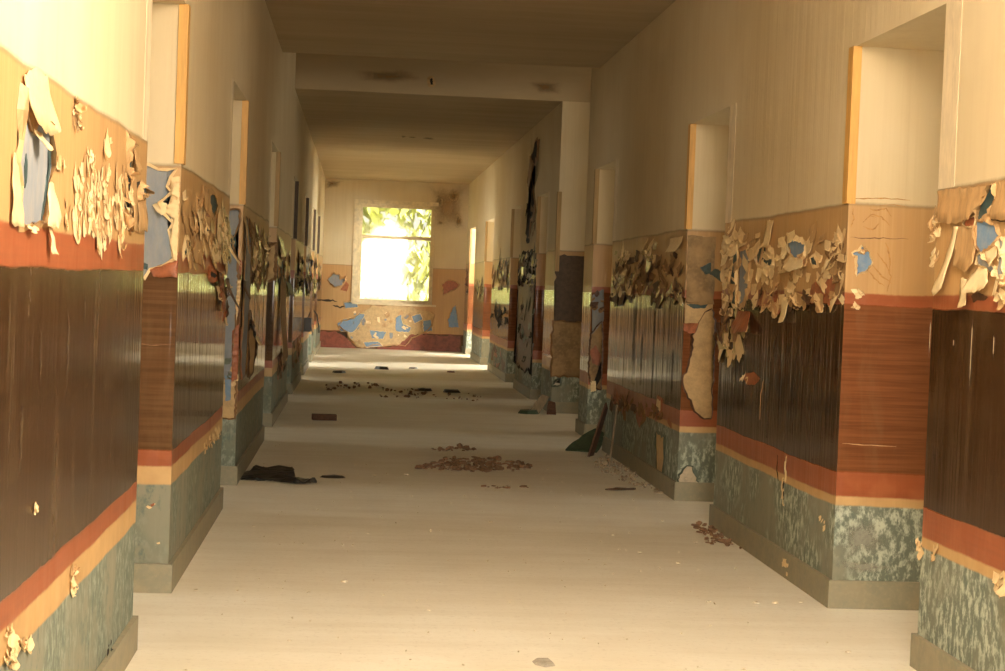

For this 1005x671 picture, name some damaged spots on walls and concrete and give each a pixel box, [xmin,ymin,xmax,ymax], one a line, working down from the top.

peeling [12,67,461,454]
peeling [441,243,538,376]
leakage [525,137,540,243]
peeling [550,218,873,473]
peeling [927,179,1005,310]
flaking render [677,465,699,482]
peeling [4,623,35,670]
peeling [992,571,1005,599]